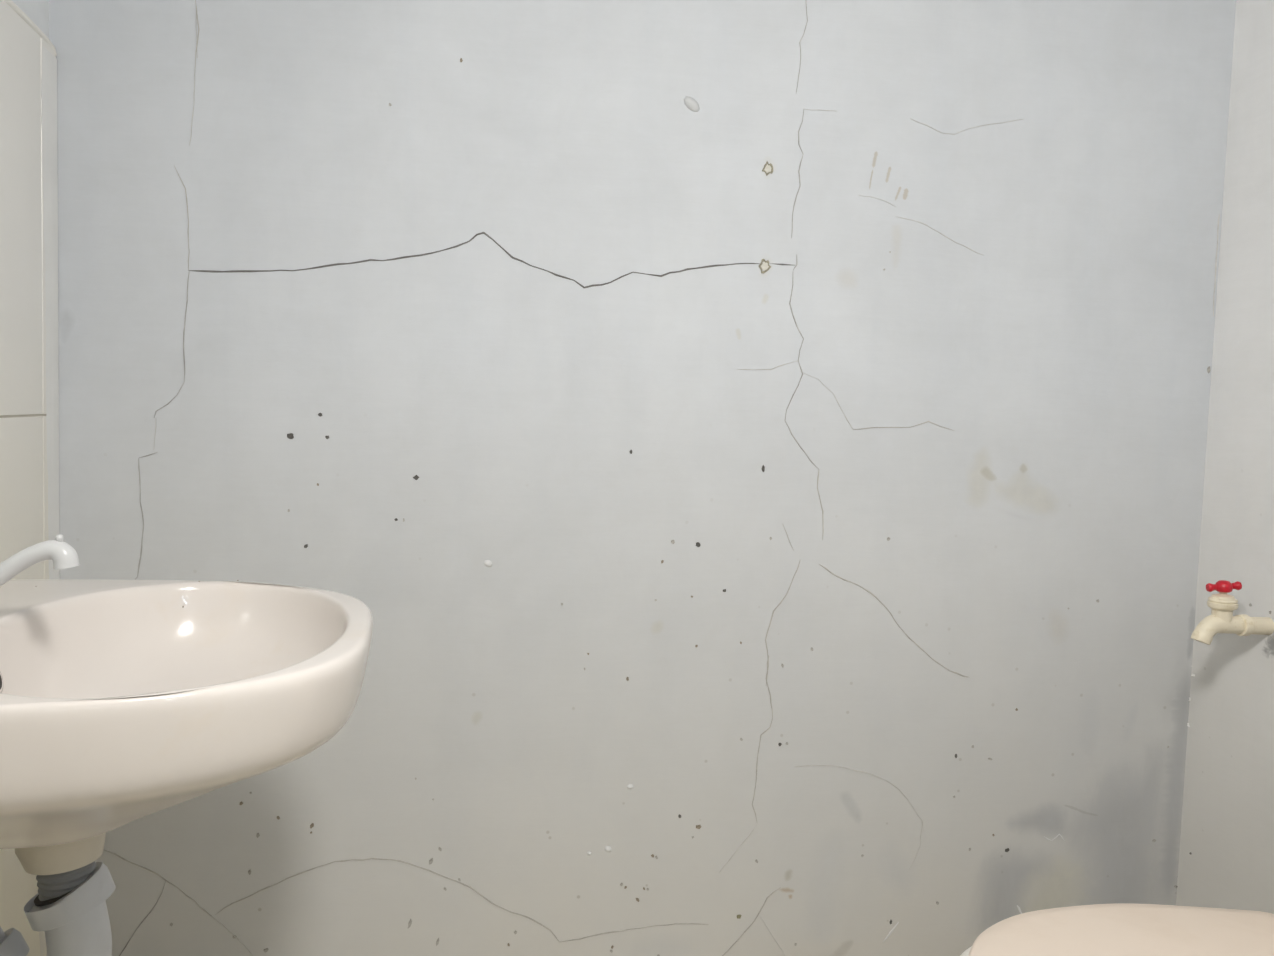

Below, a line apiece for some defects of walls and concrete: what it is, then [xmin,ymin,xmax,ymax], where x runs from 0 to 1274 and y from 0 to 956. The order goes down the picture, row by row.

crack [135,0,983,871]
crack [104,850,709,956]
crack [722,887,785,956]
water stain [957,603,1196,952]